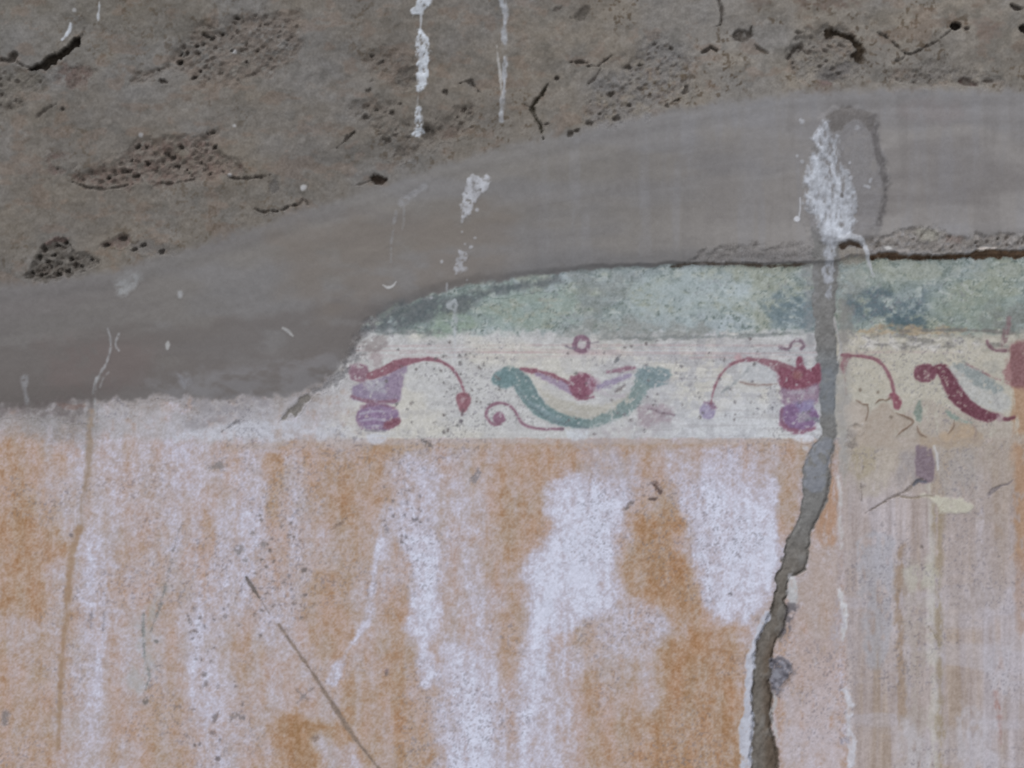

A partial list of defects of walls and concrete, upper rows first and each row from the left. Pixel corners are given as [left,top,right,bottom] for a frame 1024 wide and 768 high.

spalling [23,232,181,285]
spalling [44,126,272,195]
spalling [127,0,306,91]
spalling [345,44,480,167]
damp [409,0,434,138]
damp [369,173,571,378]
damp [495,0,510,124]
damp [792,117,876,302]
spalling [784,21,1008,92]
spalling [837,223,1024,267]
damp [559,400,685,486]
crack [670,242,1024,768]